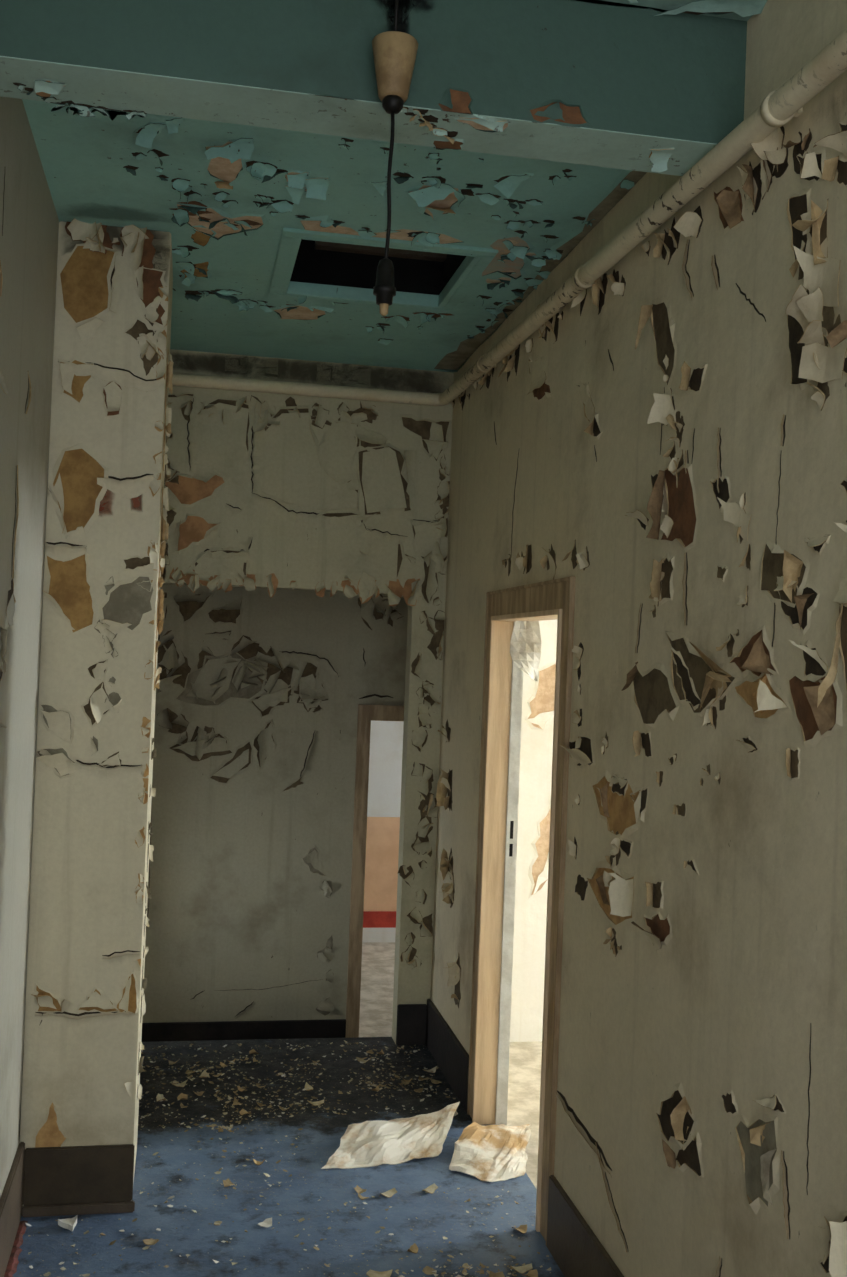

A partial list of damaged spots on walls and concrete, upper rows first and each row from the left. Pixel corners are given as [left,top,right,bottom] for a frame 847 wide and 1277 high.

peeling [642,121,847,411]
peeling [13,78,675,969]
peeling [0,577,16,682]
peeling [31,822,154,1023]
peeling [447,952,461,1009]
peeling [124,1042,144,1100]
crack [556,1090,629,1252]
peeling [655,1082,704,1179]
peeling [721,1090,790,1239]